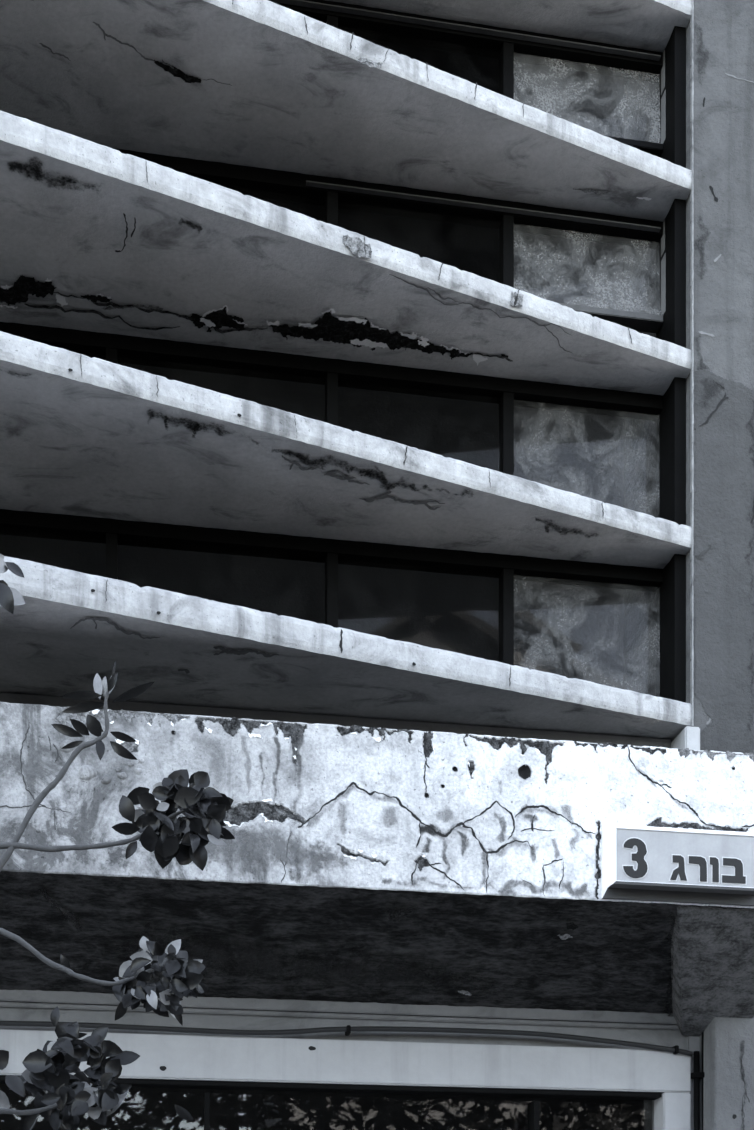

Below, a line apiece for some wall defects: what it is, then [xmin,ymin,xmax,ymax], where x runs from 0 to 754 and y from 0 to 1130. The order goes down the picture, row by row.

crack [93,22,154,61]
spalling [0,275,68,309]
spalling [183,305,247,332]
spalling [266,309,488,366]
crack [389,262,572,353]
crack [282,455,445,510]
spalling [223,799,305,827]
leakage [242,728,303,795]
peeling [337,724,435,757]
crack [275,731,595,896]
crack [626,744,754,830]
spalling [415,855,429,871]